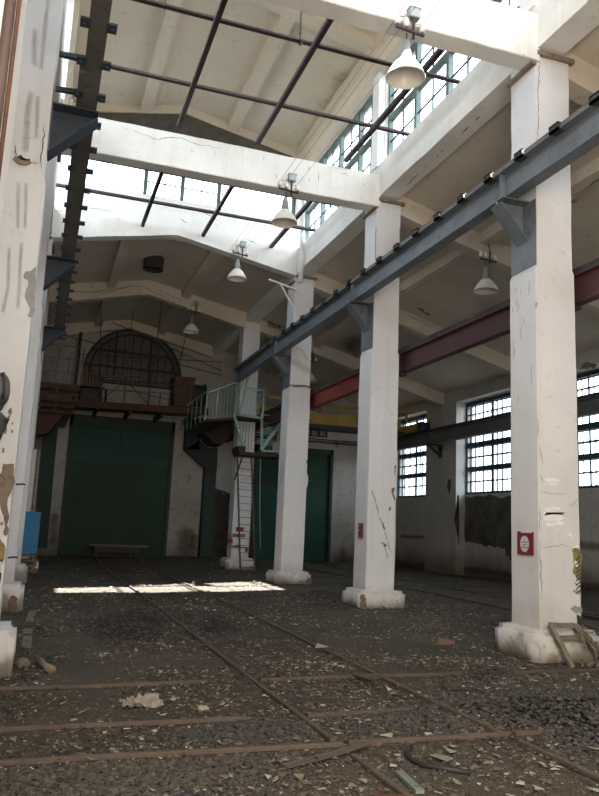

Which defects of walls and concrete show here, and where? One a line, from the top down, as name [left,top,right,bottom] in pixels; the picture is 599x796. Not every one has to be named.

spalling [13,147,32,165]
peeling [24,267,36,317]
spalling [0,464,15,536]
crack [371,489,391,557]
peeling [543,507,565,526]